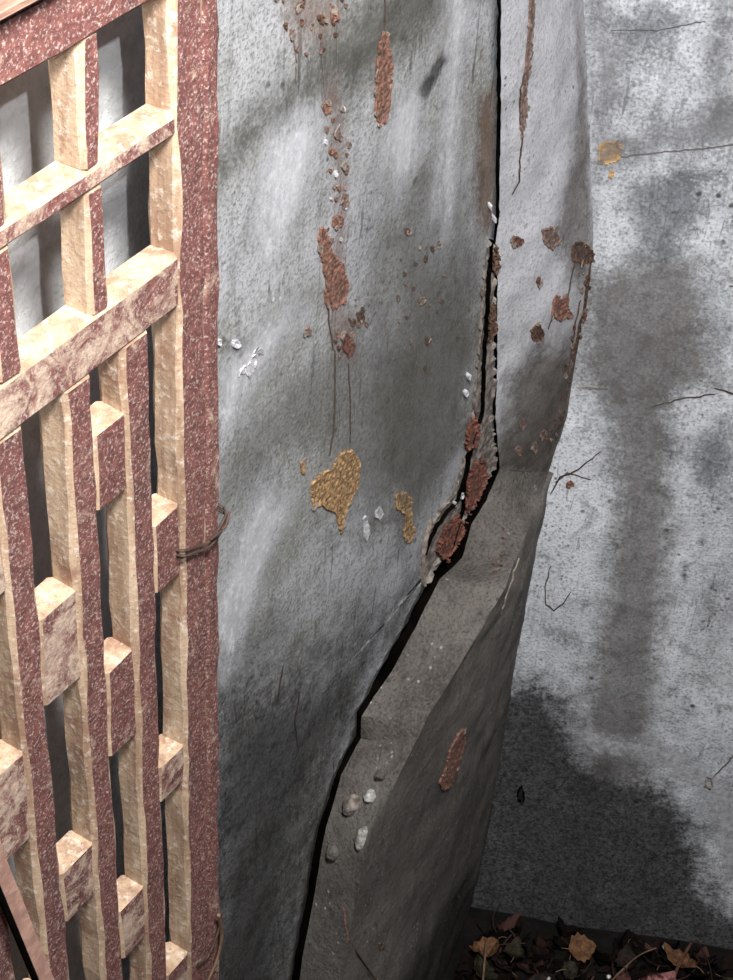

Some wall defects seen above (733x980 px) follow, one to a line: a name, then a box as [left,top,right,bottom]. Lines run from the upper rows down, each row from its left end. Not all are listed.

crack [291,39,299,79]
crack [512,74,525,194]
crack [327,308,351,456]
crack [421,202,502,587]
damp [217,499,286,674]
damp [362,506,384,540]
damp [411,172,733,980]
crack [276,666,300,713]
damp [217,618,389,980]